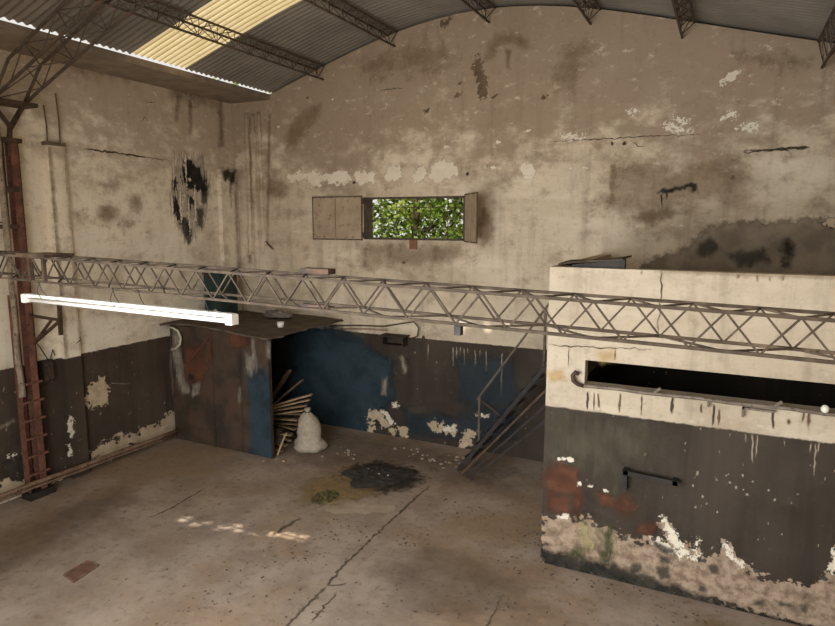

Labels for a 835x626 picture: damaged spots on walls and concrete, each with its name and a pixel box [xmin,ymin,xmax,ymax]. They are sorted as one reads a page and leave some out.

crack [555,134,691,147]
crack [744,146,809,154]
peeling [281,159,469,188]
peeling [169,153,210,244]
leakage [639,183,696,221]
peeling [640,217,835,275]
peeling [84,376,120,411]
peeling [89,410,175,461]
peeling [365,402,409,438]
peeling [427,421,481,449]
crack [286,491,423,626]
peeling [540,513,835,626]